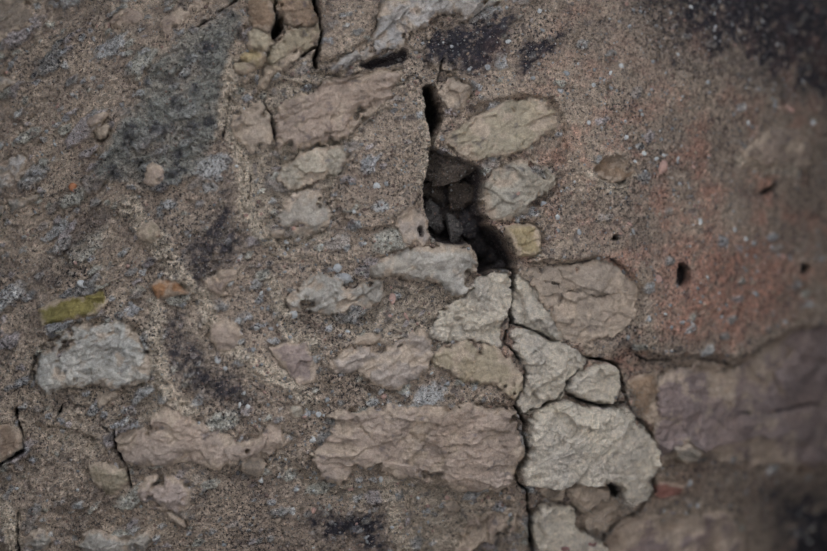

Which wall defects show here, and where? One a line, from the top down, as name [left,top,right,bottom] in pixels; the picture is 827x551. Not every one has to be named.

crack [311,0,323,19]
crack [302,44,322,69]
crack [550,256,633,289]
crack [504,265,532,330]
crack [695,357,745,366]
crack [514,344,672,551]